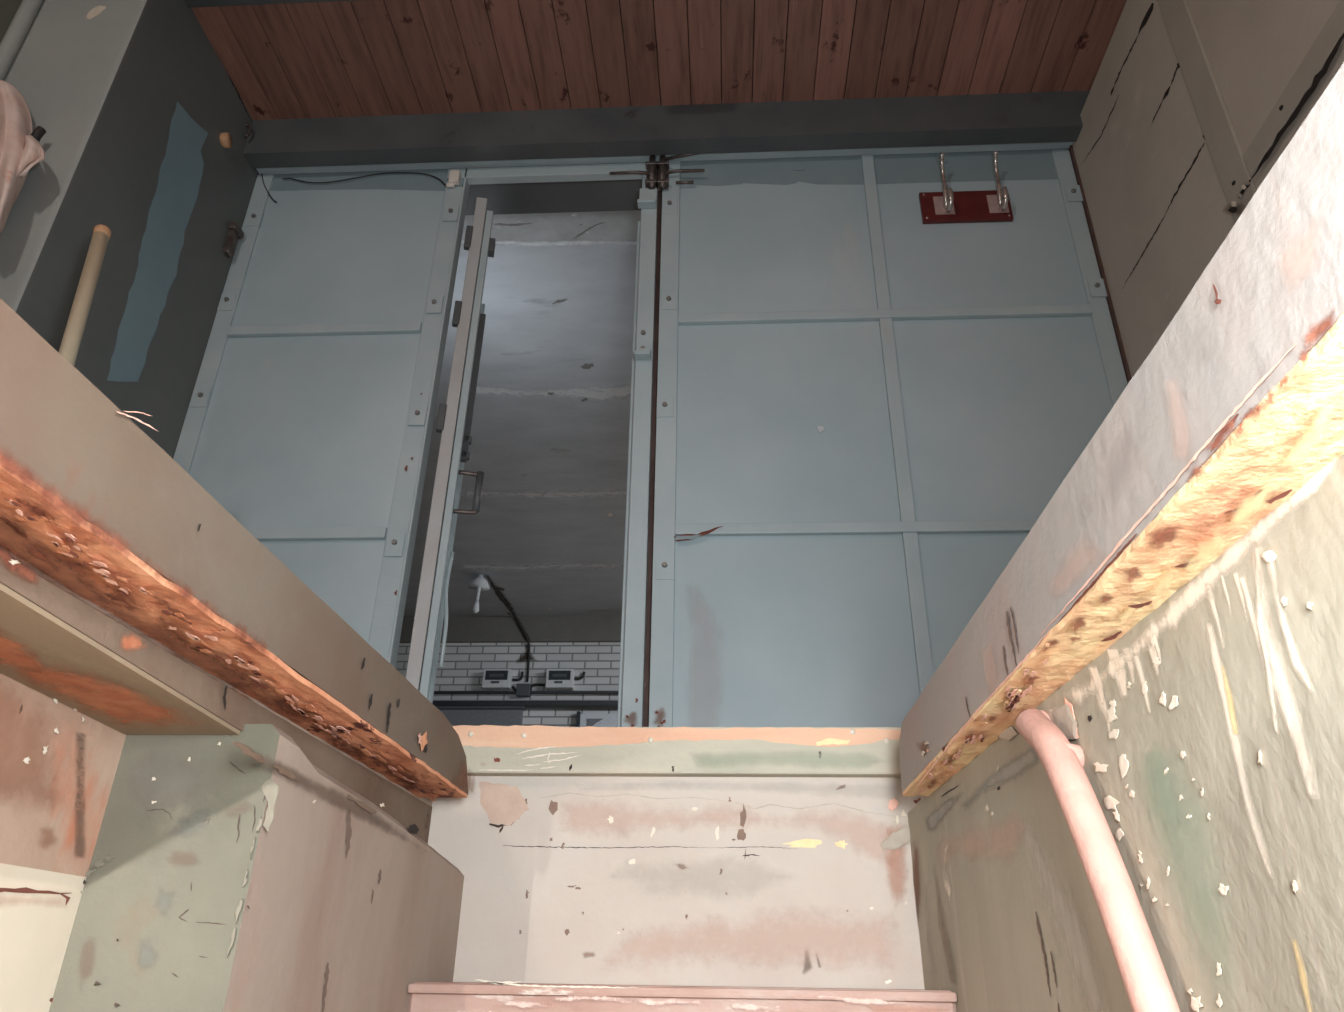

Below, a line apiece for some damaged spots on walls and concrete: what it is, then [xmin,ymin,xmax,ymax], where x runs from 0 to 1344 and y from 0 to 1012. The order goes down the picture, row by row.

crack [1082,3,1154,163]
crack [1151,63,1180,124]
crack [1238,33,1344,199]
crack [1122,134,1205,289]
rust [0,545,36,582]
peeling [6,500,152,595]
rust [0,635,173,724]
peeling [1127,681,1178,711]
rust [418,732,428,753]
rust [76,736,84,856]
peeling [1094,754,1135,841]
peeling [1186,988,1222,1012]